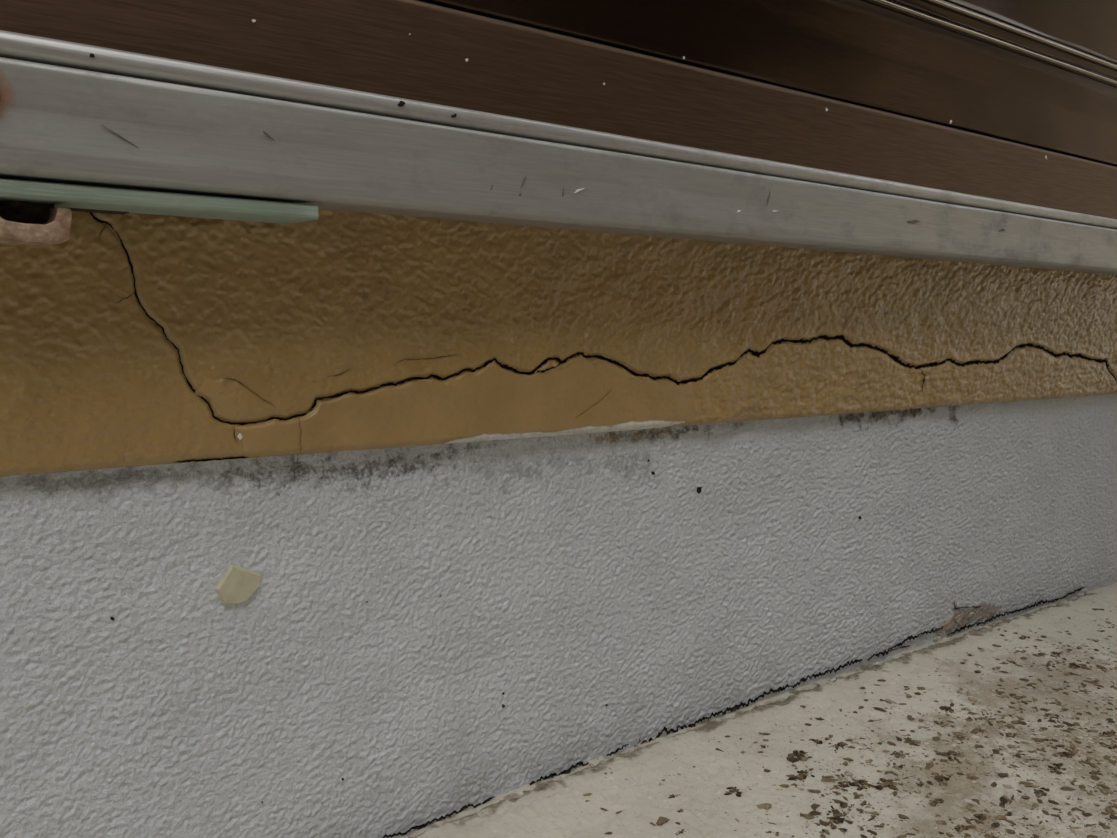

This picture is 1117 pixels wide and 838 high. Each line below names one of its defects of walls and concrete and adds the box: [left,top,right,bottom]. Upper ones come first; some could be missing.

damp [256,443,452,495]
crack [88,212,1117,463]
damp [830,408,934,428]
crack [382,587,1093,838]